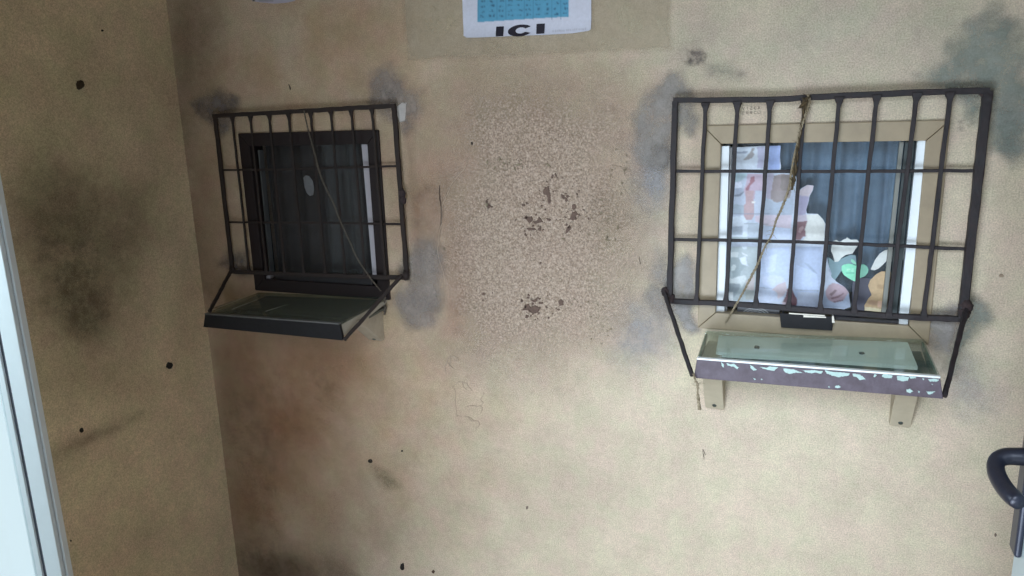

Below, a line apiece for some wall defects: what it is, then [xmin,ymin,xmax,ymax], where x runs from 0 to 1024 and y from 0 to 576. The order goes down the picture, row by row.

peeling [438,92,635,351]